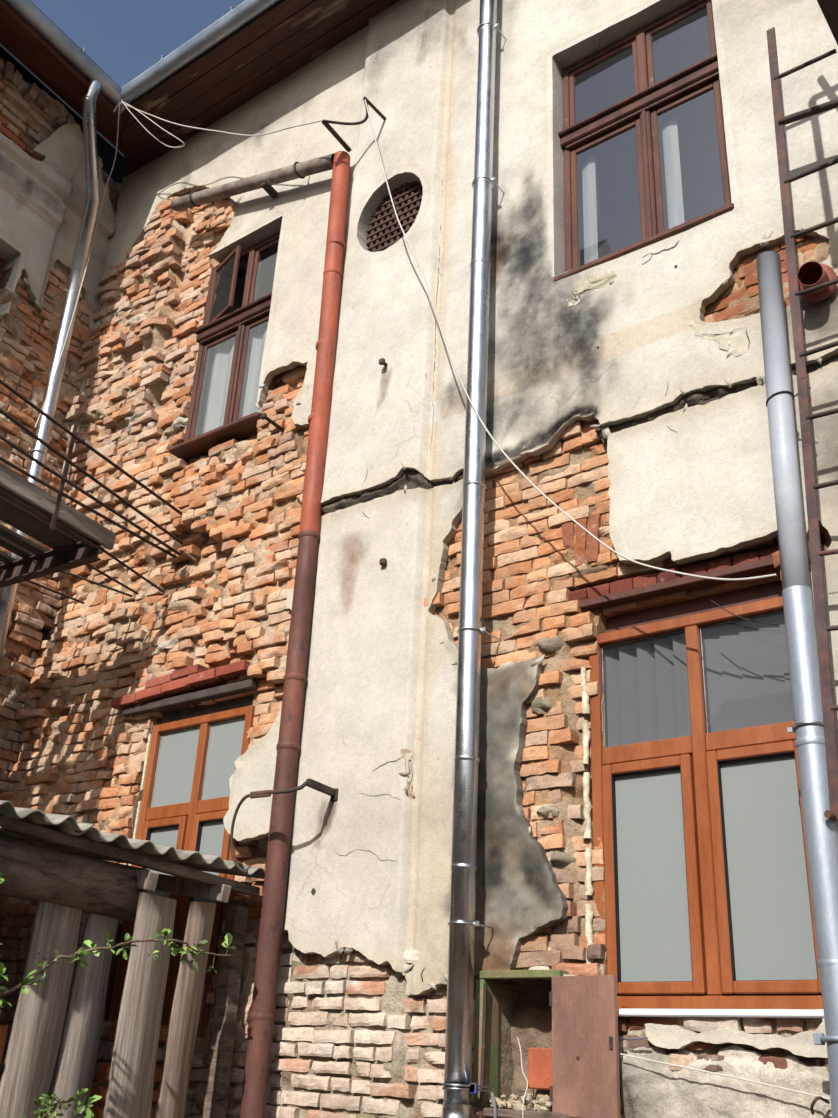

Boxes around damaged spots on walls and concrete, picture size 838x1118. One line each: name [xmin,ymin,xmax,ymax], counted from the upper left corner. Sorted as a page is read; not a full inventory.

crack [322,168,464,518]
water stain [491,199,543,272]
crack [589,372,763,445]
spalling [688,225,837,358]
crack [792,349,838,375]
spalling [0,183,309,839]
spalling [481,419,781,981]
water stain [525,863,545,897]
spalling [0,895,37,1081]
spalling [226,836,268,1118]
spalling [265,934,447,1118]
spalling [618,1017,829,1072]